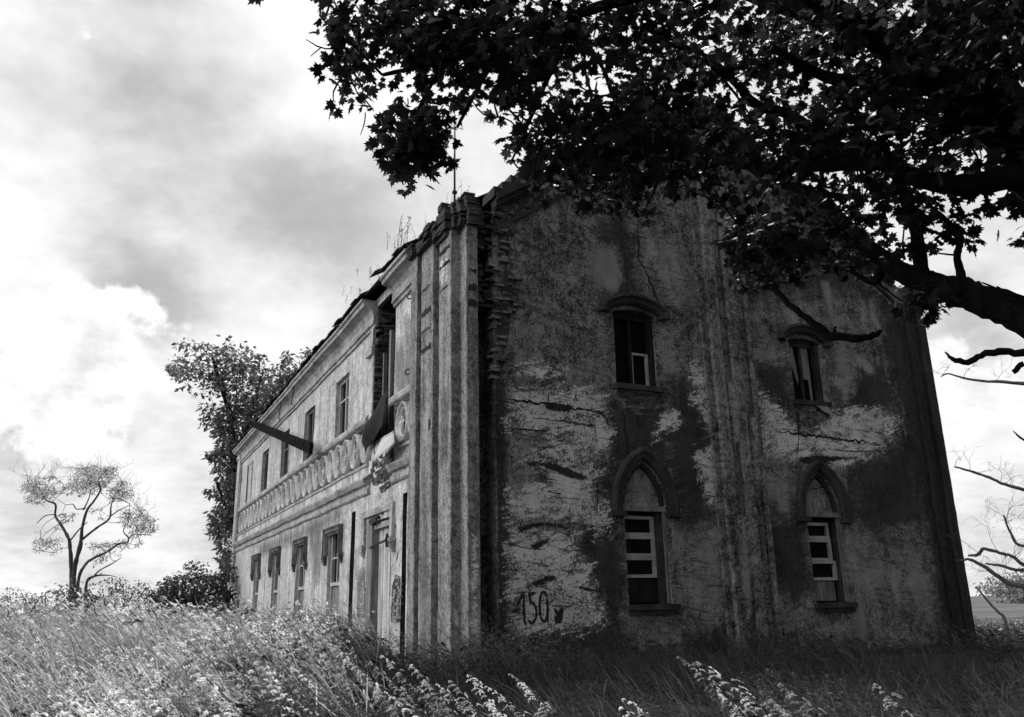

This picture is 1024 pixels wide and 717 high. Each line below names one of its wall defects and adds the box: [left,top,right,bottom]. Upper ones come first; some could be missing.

crack [505,389,629,455]
water stain [496,372,728,663]
crack [776,412,880,456]
water stain [745,225,945,613]